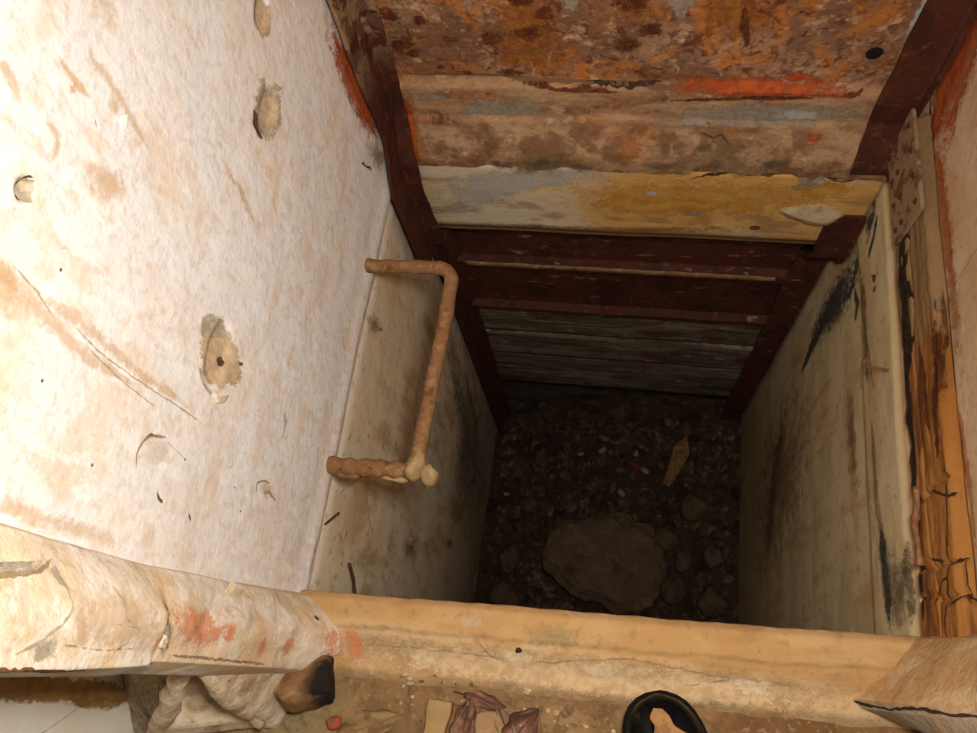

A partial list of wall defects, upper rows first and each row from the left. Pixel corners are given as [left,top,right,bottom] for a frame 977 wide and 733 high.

spalling [253,78,282,141]
corrosion [329,24,383,170]
corrosion [671,73,850,102]
corrosion [931,16,977,142]
spalling [14,175,34,202]
spalling [199,314,243,404]
corrosion [918,152,960,457]
leakage [848,396,857,531]
crack [891,221,977,629]
spalling [0,560,51,579]
leakage [871,510,915,626]
crack [853,700,977,718]